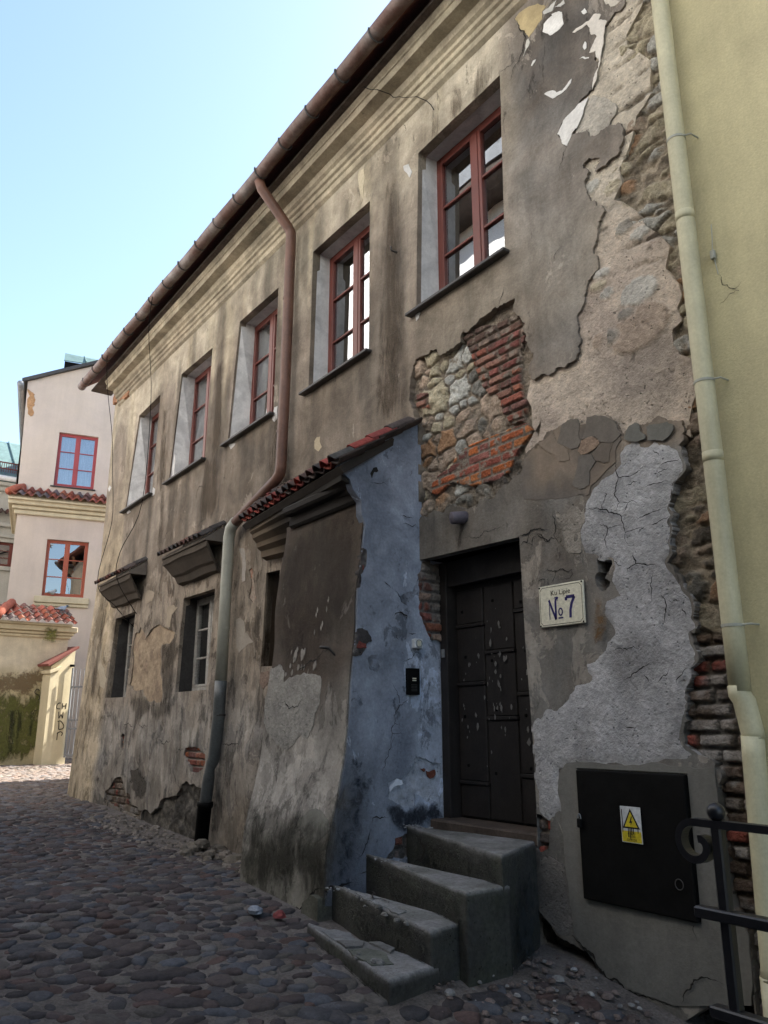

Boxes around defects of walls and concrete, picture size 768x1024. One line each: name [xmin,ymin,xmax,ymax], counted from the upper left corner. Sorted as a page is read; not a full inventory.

crack [364,86,434,110]
spalling [27,389,35,416]
spalling [414,0,756,915]
crack [584,452,686,622]
crack [613,646,685,682]
spalling [105,747,205,839]
leakage [242,814,352,898]